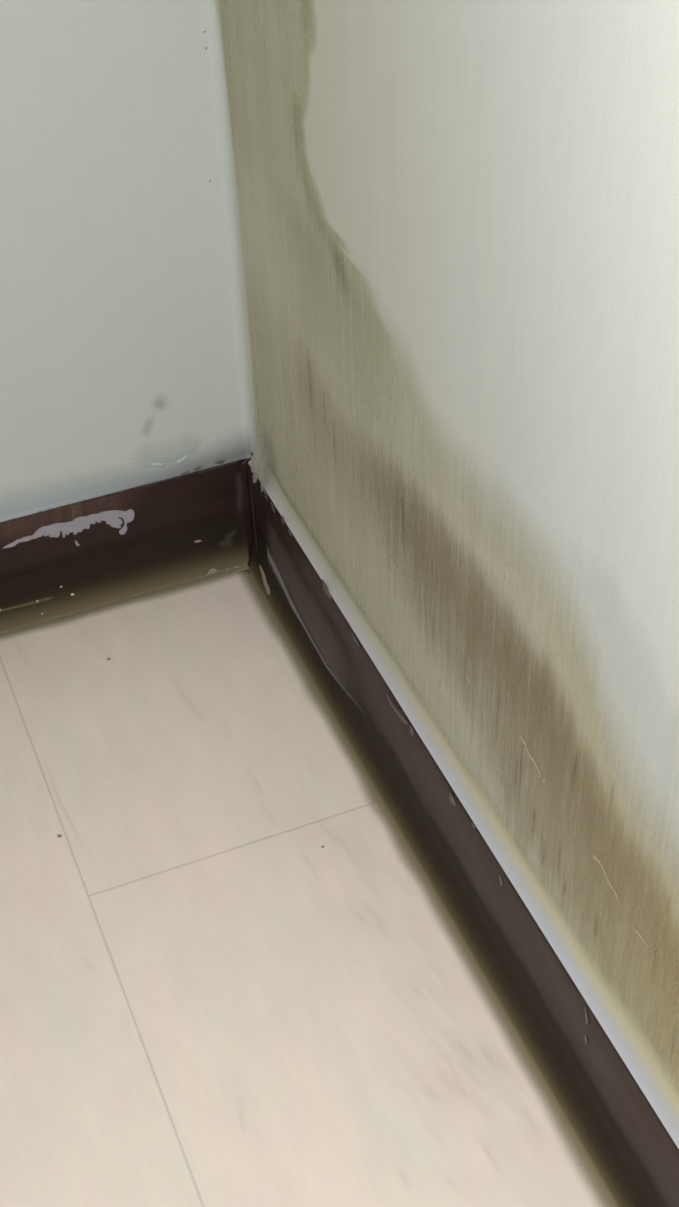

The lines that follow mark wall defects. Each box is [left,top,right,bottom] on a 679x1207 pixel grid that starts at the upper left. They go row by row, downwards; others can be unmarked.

peeling [2,509,134,549]
water stain [383,481,679,1096]